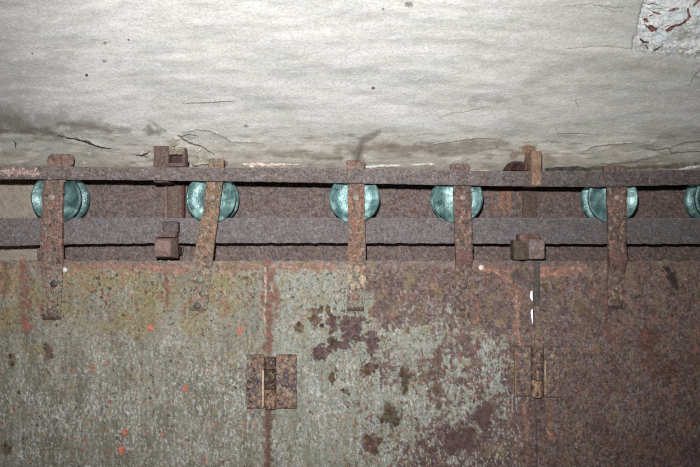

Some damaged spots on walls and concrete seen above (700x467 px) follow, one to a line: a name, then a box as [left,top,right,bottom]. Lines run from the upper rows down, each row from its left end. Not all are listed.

peeling [633,0,700,59]
crack [58,135,111,149]
crack [177,134,214,155]
crack [601,141,700,165]
rust [219,260,347,353]
rust [480,264,522,346]
rust [429,346,445,409]